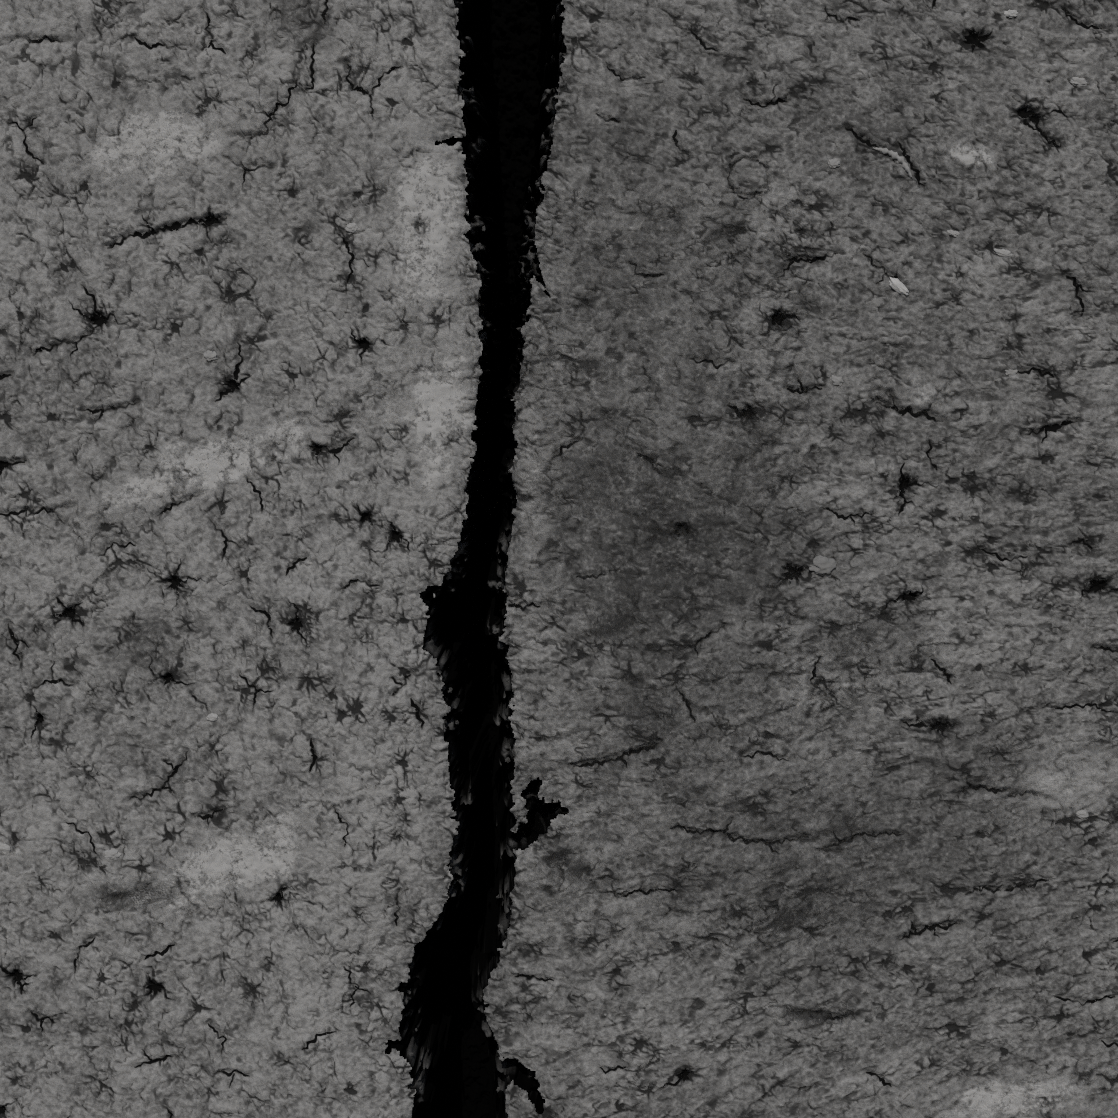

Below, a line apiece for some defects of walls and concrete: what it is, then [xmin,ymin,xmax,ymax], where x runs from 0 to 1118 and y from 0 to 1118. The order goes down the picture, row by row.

crack [109,216,216,248]
crack [342,237,369,284]
crack [326,438,354,462]
crack [548,441,577,471]
crack [381,0,569,1118]
crack [343,579,380,588]
crack [309,739,317,771]
crack [335,810,349,847]
crack [344,967,369,1006]
crack [302,1031,336,1050]